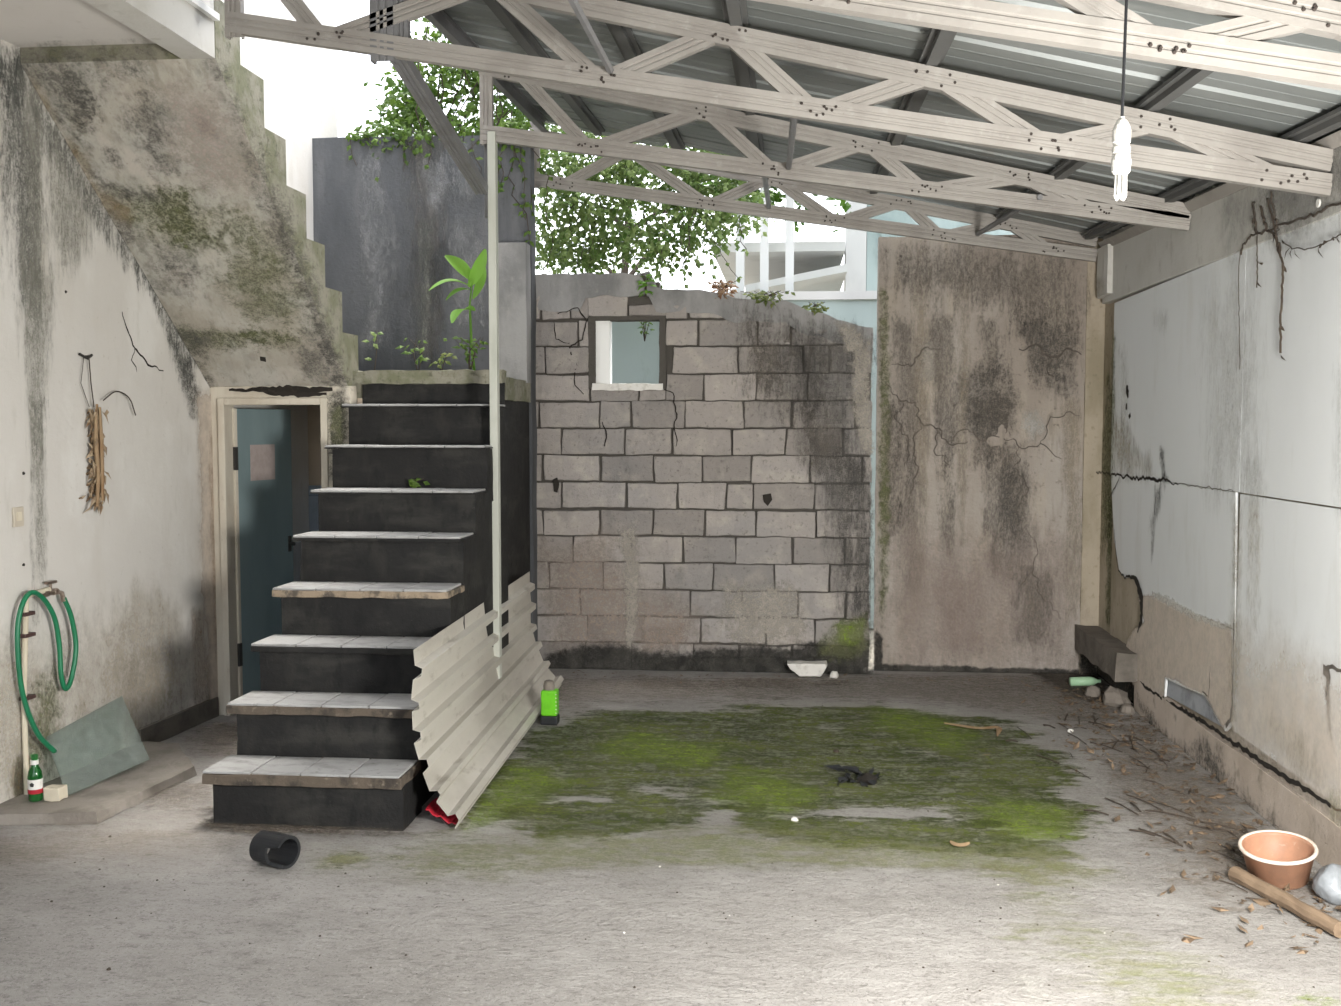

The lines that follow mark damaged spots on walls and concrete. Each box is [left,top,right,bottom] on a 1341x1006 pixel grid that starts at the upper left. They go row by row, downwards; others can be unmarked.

water stain [0,46,349,547]
water stain [410,134,488,358]
water stain [544,310,1152,724]
water stain [885,247,1078,641]
crack [1096,471,1234,497]
peeling [1126,591,1232,725]
crack [1140,619,1341,812]